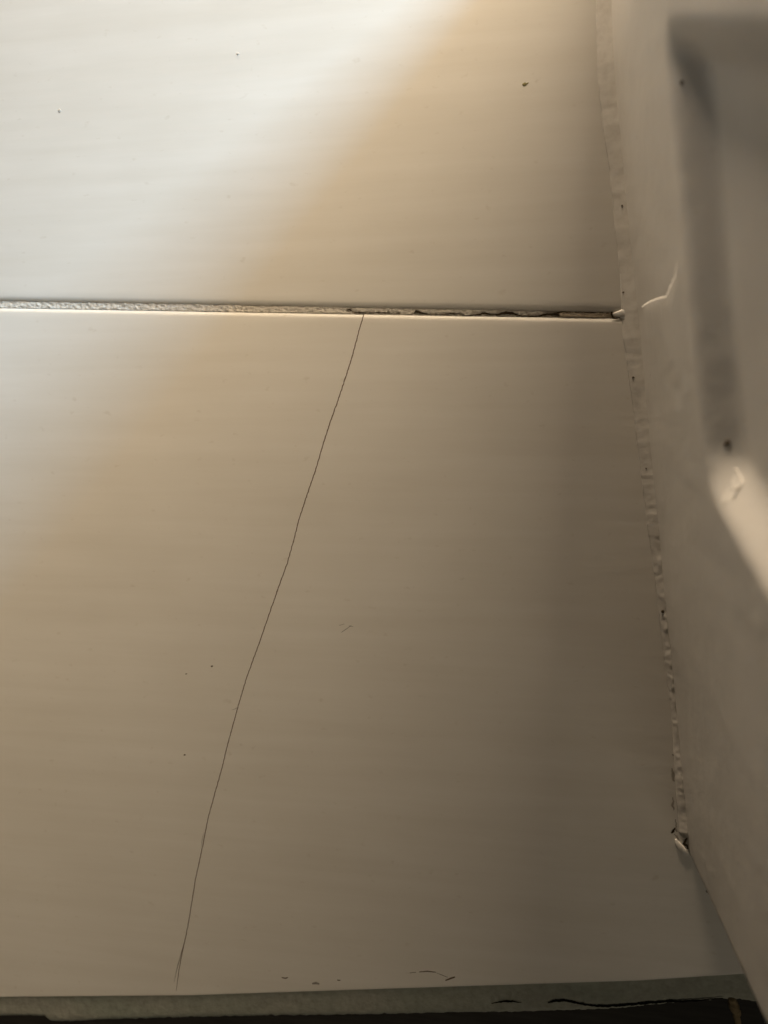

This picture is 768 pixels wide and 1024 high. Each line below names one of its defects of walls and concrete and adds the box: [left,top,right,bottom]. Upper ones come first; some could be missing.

crack [174,309,562,990]
crack [548,998,723,1008]